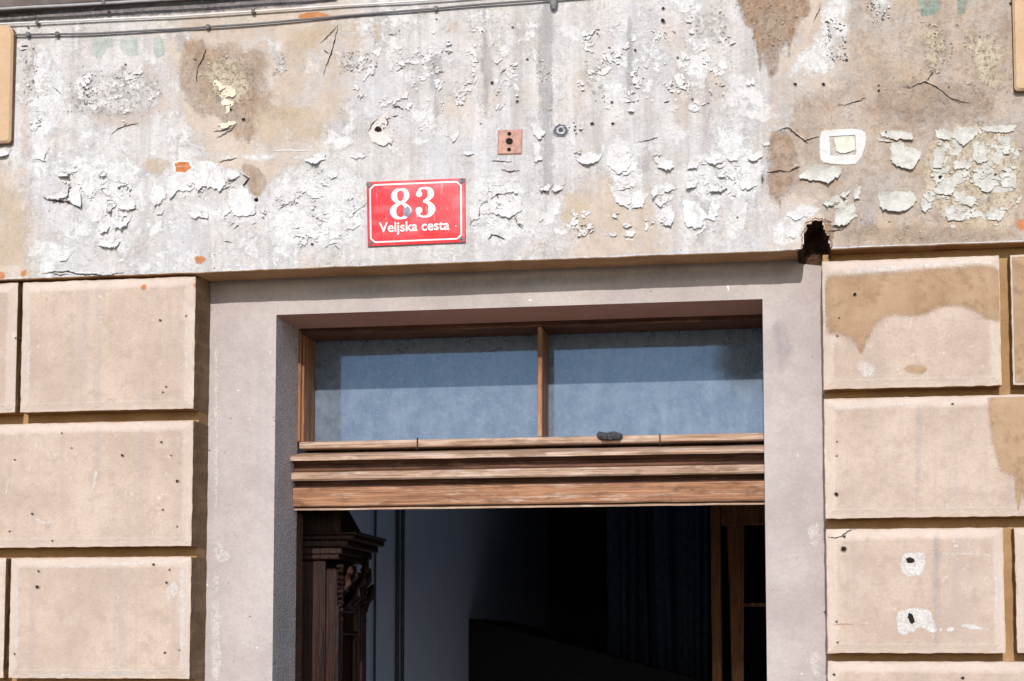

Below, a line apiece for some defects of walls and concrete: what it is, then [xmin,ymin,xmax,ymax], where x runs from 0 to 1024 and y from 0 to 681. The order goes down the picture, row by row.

peeling [20,41,371,258]
water stain [176,22,343,199]
crack [322,25,338,72]
peeling [340,27,519,146]
flaking render [554,0,1024,265]
water stain [736,0,853,116]
crack [905,70,969,103]
water stain [825,260,1000,377]
water stain [834,397,1024,512]